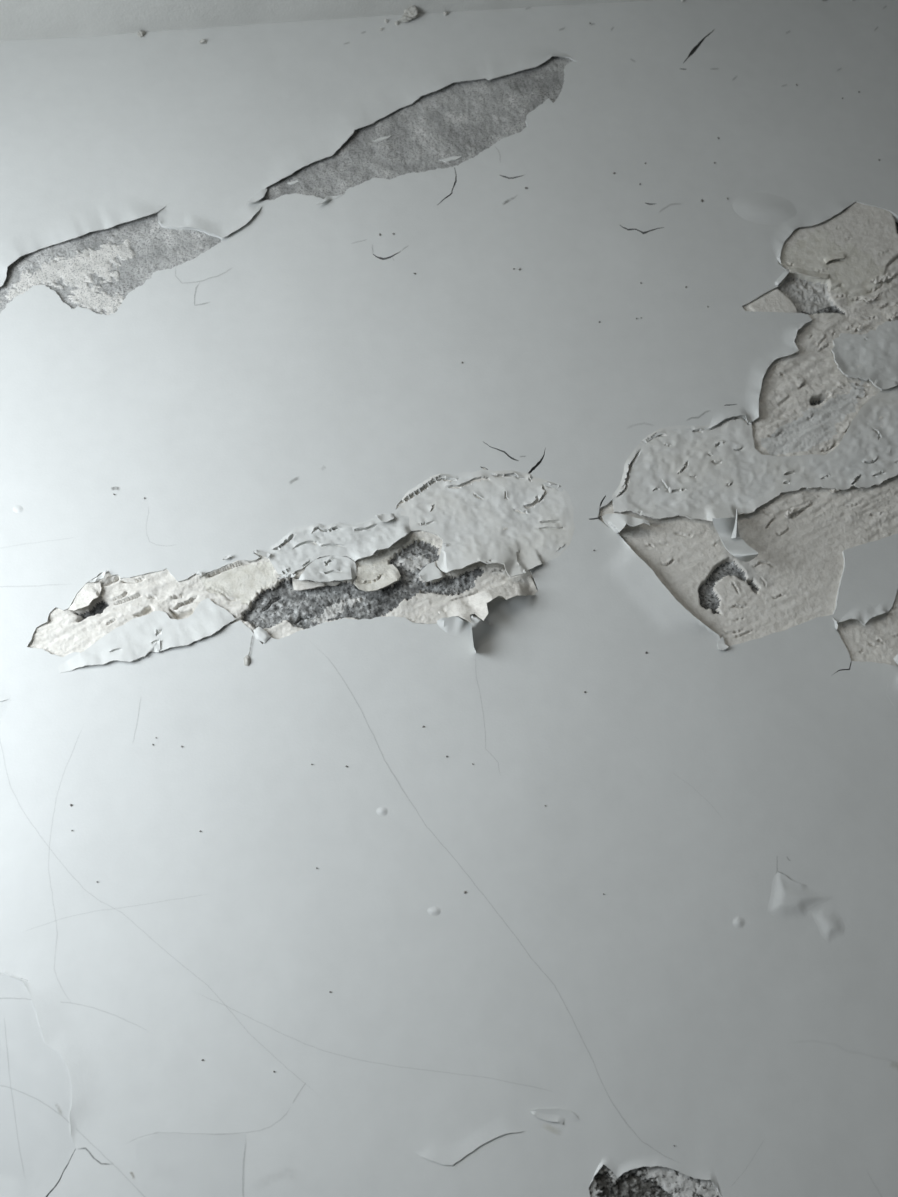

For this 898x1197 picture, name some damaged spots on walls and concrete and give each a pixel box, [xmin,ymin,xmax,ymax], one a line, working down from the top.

peeling [0,35,577,315]
flaking render [594,197,898,709]
spalling [29,468,575,673]
crack [46,1148,99,1197]
spalling [589,1153,722,1197]